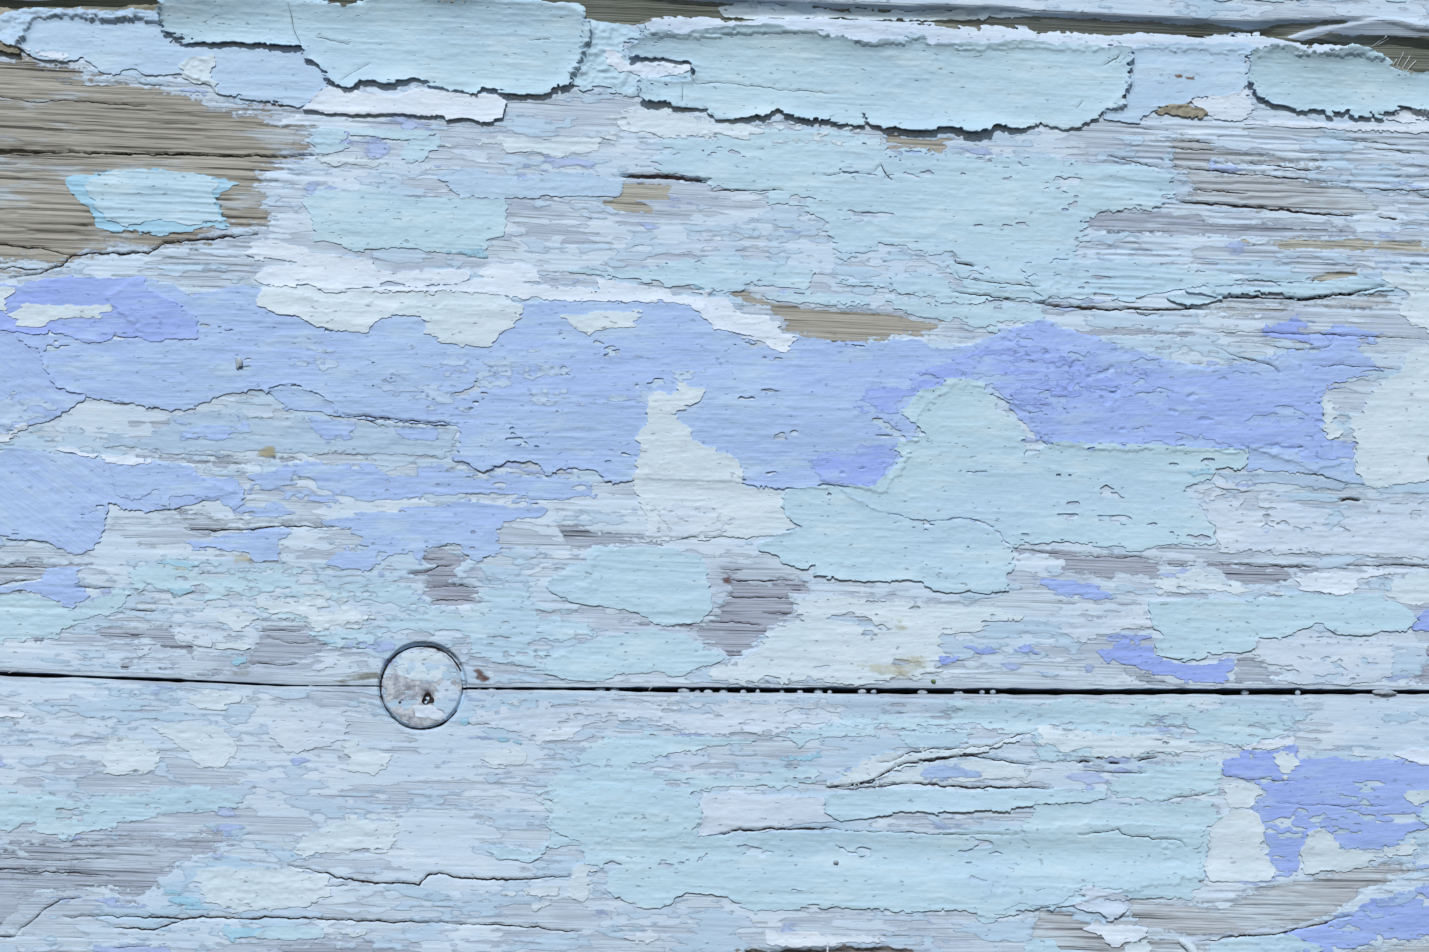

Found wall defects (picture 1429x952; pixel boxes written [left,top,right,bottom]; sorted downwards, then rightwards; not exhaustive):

crack [0,84,146,107]
crack [1,152,308,165]
crack [0,234,257,278]
peeling [0,0,1429,696]
peeling [268,706,392,776]
peeling [460,697,1429,952]
peeling [165,815,399,942]
crack [0,857,578,948]